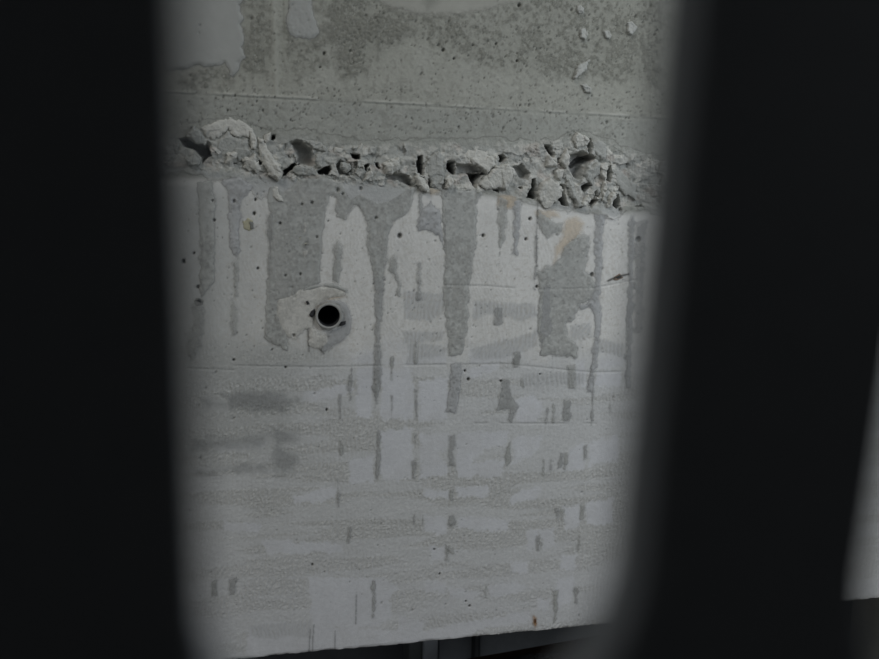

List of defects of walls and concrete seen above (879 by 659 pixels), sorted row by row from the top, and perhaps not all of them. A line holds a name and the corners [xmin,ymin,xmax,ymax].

water stain [197,177,253,297]
water stain [264,178,485,413]
water stain [497,197,520,255]
water stain [534,210,605,423]
water stain [625,218,635,378]
water stain [497,380,519,423]